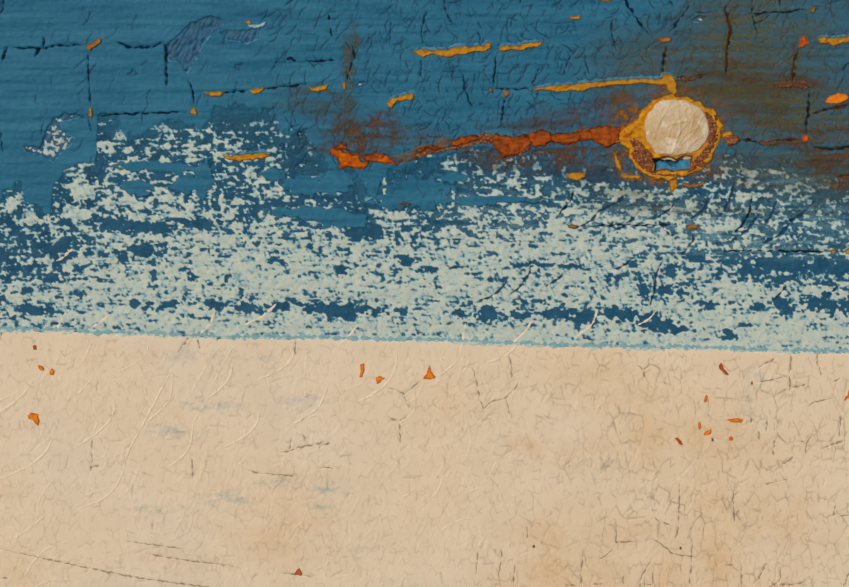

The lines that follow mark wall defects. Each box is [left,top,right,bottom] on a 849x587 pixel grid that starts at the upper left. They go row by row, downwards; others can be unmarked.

crack [2,39,91,101]
crack [89,82,194,131]
crack [119,42,168,84]
peeling [164,16,266,74]
crack [286,46,355,80]
peeling [413,39,543,58]
corrosion [329,91,641,169]
crack [493,57,539,119]
crack [611,0,648,46]
crack [744,95,849,151]
peeling [799,34,849,48]
peeling [0,72,849,355]